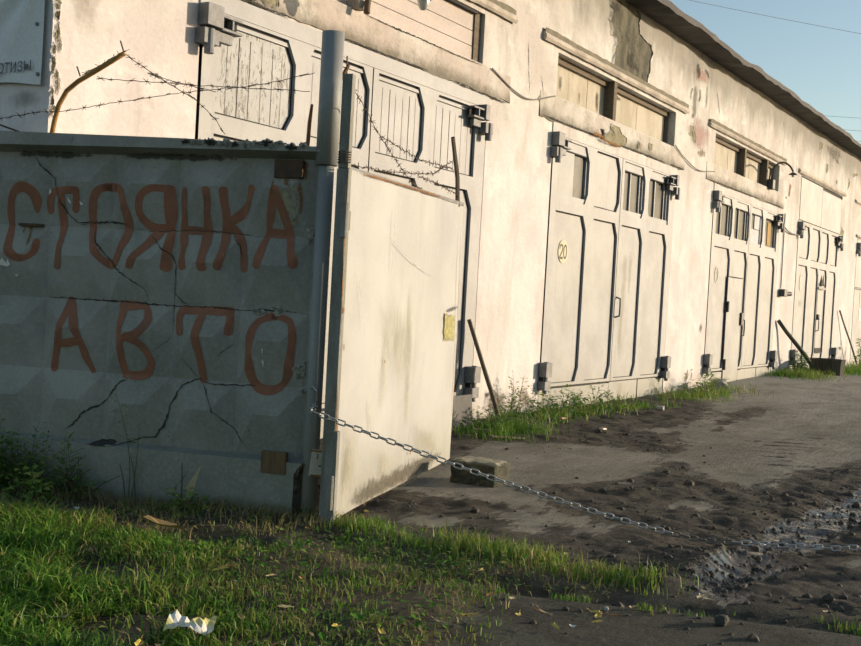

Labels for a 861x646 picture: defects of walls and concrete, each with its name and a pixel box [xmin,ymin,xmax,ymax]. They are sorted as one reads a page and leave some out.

flaking render [607,0,654,84]
crack [35,156,308,447]